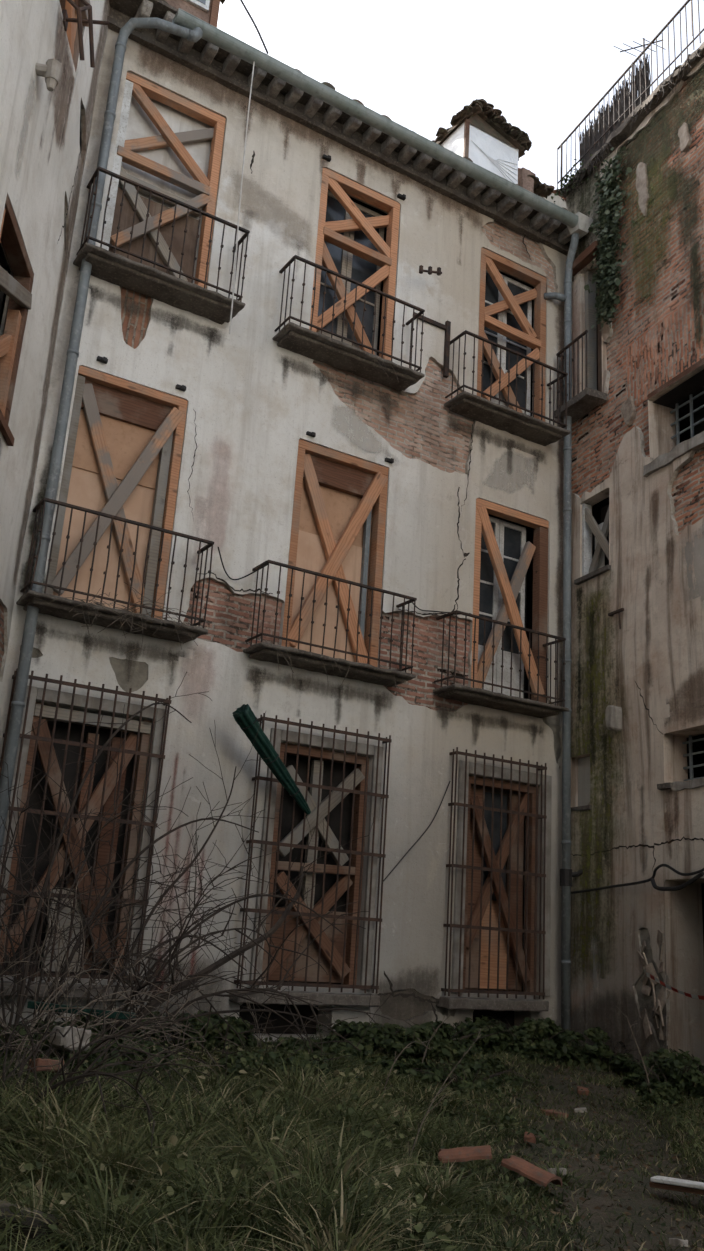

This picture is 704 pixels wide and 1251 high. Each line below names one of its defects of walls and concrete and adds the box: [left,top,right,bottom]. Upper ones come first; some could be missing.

flaking render [120,287,153,349]
flaking render [571,63,704,505]
crack [187,409,197,514]
flaking render [313,356,476,475]
crack [399,420,474,617]
flaking render [667,447,704,535]
flaking render [0,599,43,682]
flaking render [183,577,285,652]
flaking render [380,605,472,712]
crack [572,836,704,871]
flaking render [633,928,671,1046]